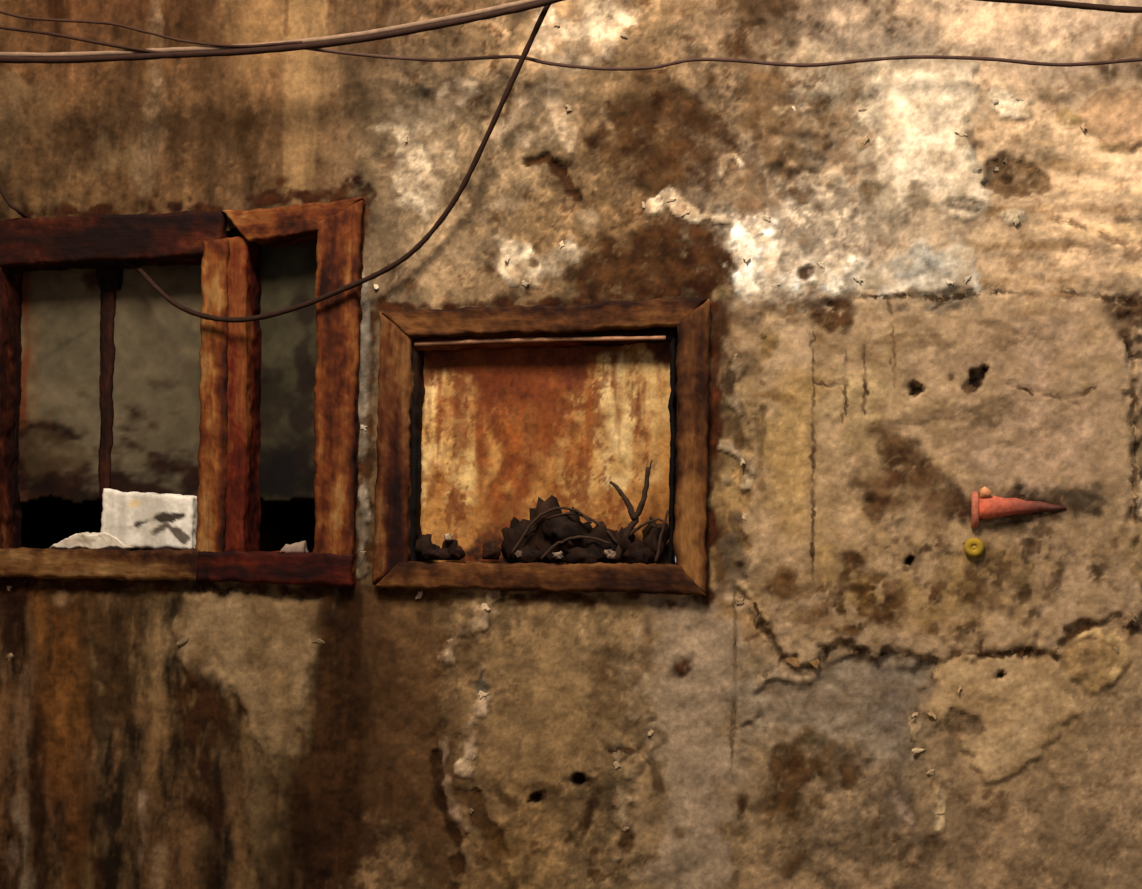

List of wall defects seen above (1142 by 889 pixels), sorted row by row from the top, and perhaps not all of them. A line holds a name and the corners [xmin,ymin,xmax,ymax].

damp [585,70,739,191]
corrosion [246,175,376,231]
corrosion [527,214,740,463]
corrosion [419,342,671,563]
corrosion [192,581,314,597]
crack [732,584,784,677]
crack [968,624,1098,661]
damp [174,669,240,827]
damp [287,585,375,889]
crack [728,700,736,778]
flaking render [741,628,1130,831]
flaking render [923,770,945,858]